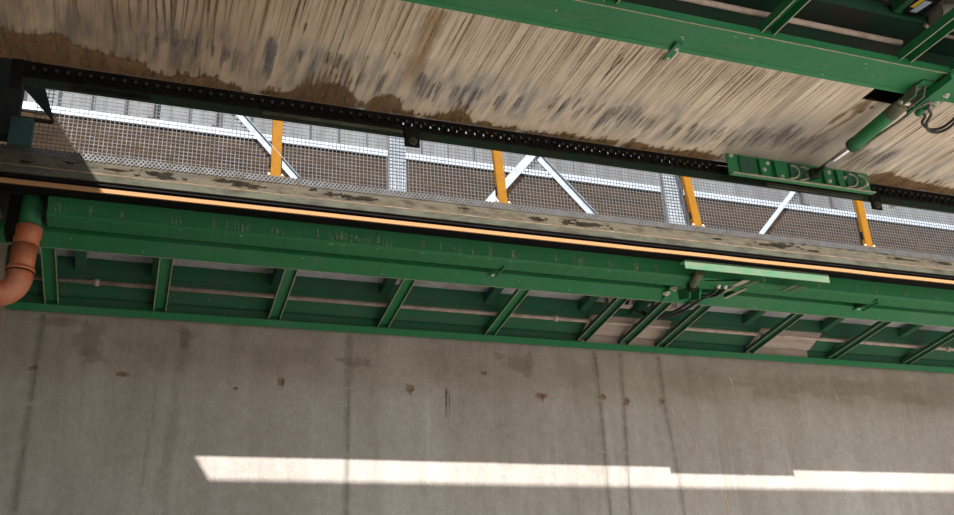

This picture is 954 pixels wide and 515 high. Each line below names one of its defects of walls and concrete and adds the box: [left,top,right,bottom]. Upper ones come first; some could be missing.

leakage [0,0,723,161]